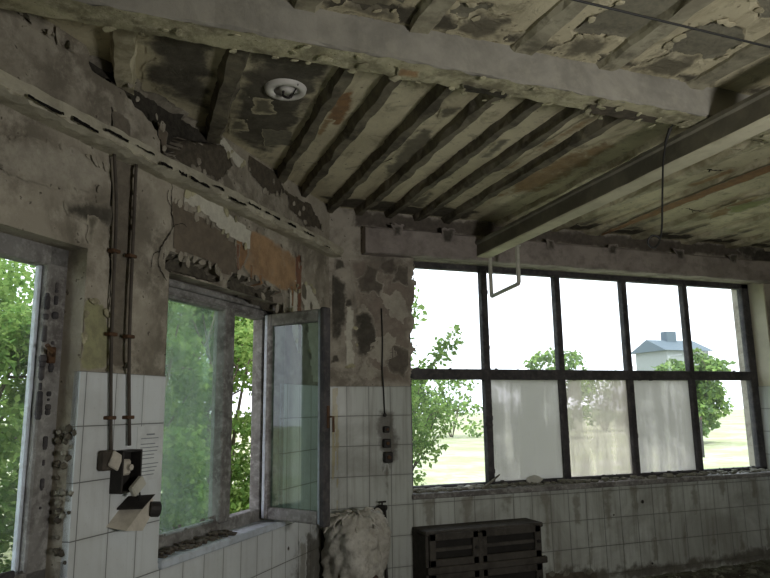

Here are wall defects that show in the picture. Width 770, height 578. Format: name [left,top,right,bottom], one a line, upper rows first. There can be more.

peeling [446,1,494,22]
peeling [574,0,679,40]
peeling [663,18,745,61]
peeling [749,0,770,18]
spalling [449,76,511,104]
spalling [583,104,662,128]
spalling [28,62,323,237]
peeling [354,257,409,324]
flaking render [344,304,369,369]
peeling [367,332,409,380]
spalling [53,424,77,524]
spalling [52,535,67,565]